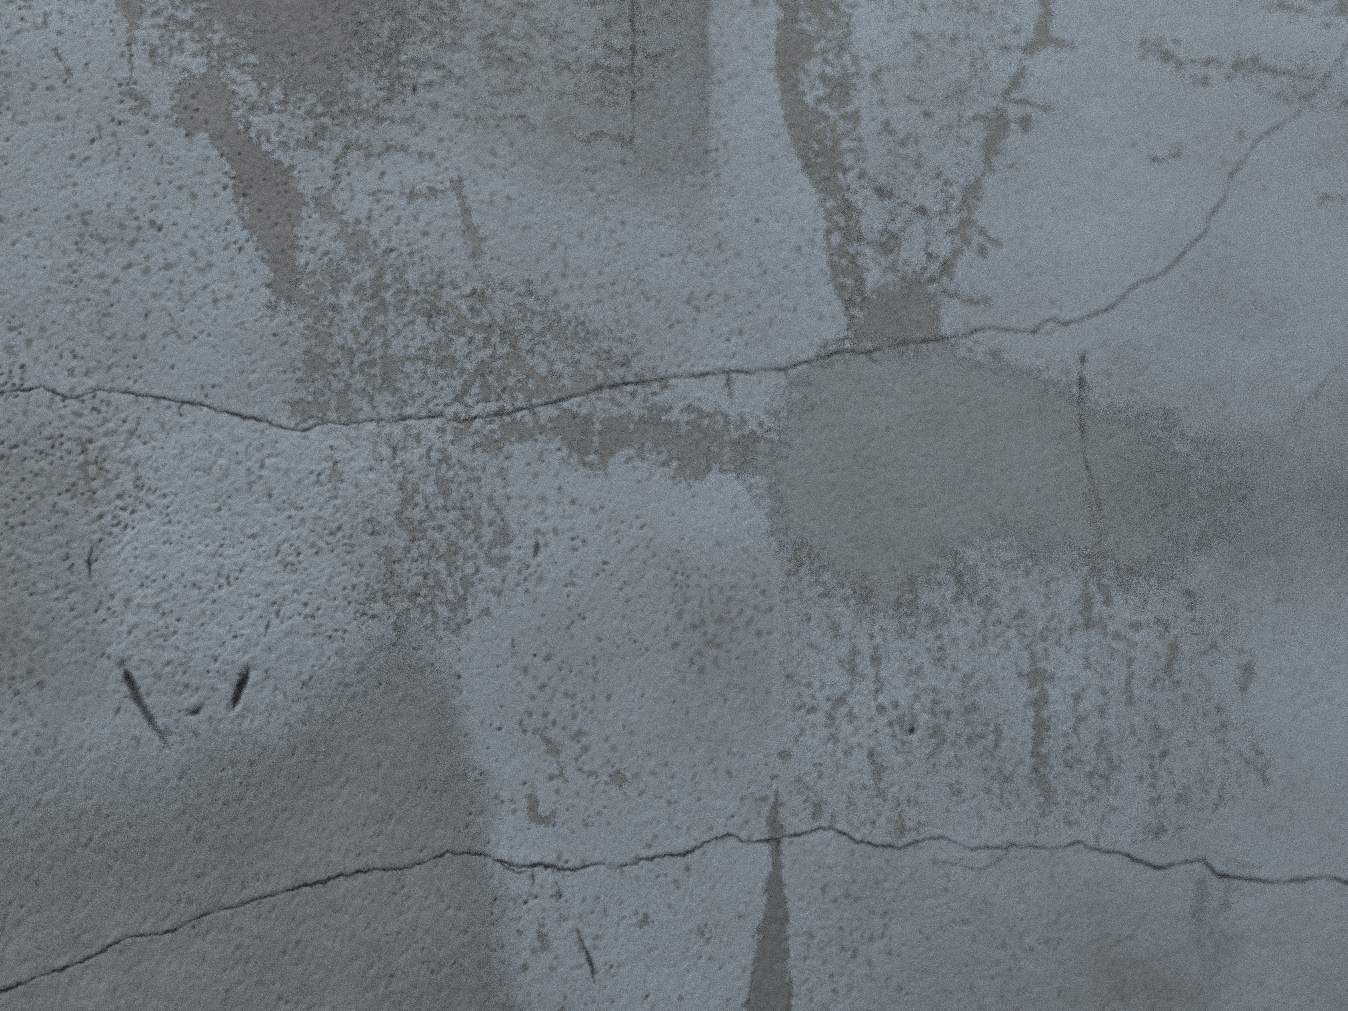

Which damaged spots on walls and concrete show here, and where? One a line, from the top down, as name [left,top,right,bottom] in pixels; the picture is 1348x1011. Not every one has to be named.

crack [629,0,637,152]
peeling [1128,40,1348,109]
crack [0,51,1345,432]
peeling [785,545,1254,840]
crack [0,826,1348,992]
peeling [745,728,805,1011]